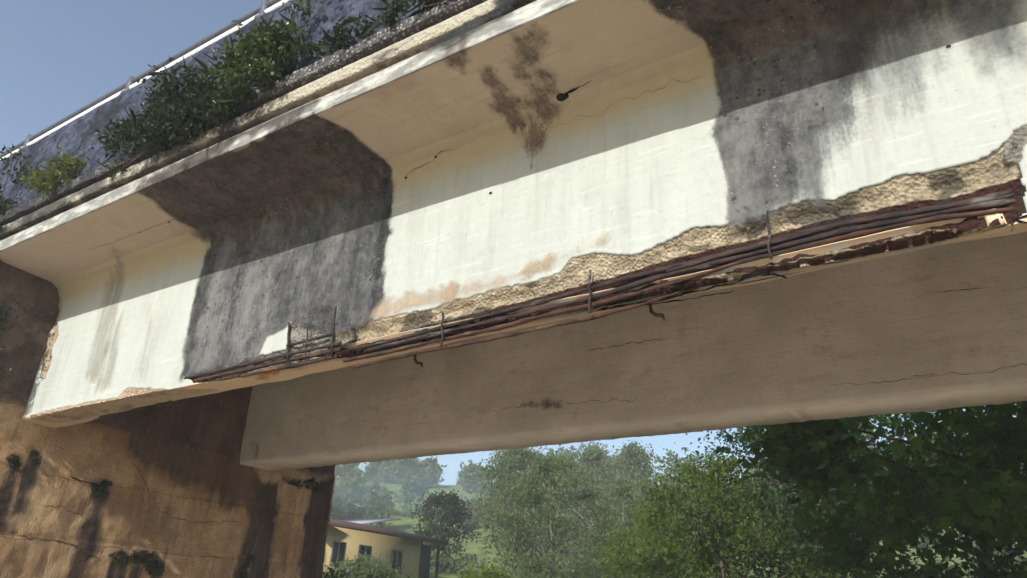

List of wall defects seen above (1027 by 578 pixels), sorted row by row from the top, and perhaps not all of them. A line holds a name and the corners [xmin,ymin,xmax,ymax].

damp [483,32,559,167]
crack [528,77,699,135]
damp [650,0,1017,227]
damp [136,99,393,378]
spalling [30,125,1027,423]
crack [1011,215,1027,224]
damp [0,456,39,534]
crack [10,532,102,562]
damp [68,490,109,578]
damp [107,557,159,578]
damp [128,388,279,578]
damp [300,477,334,578]